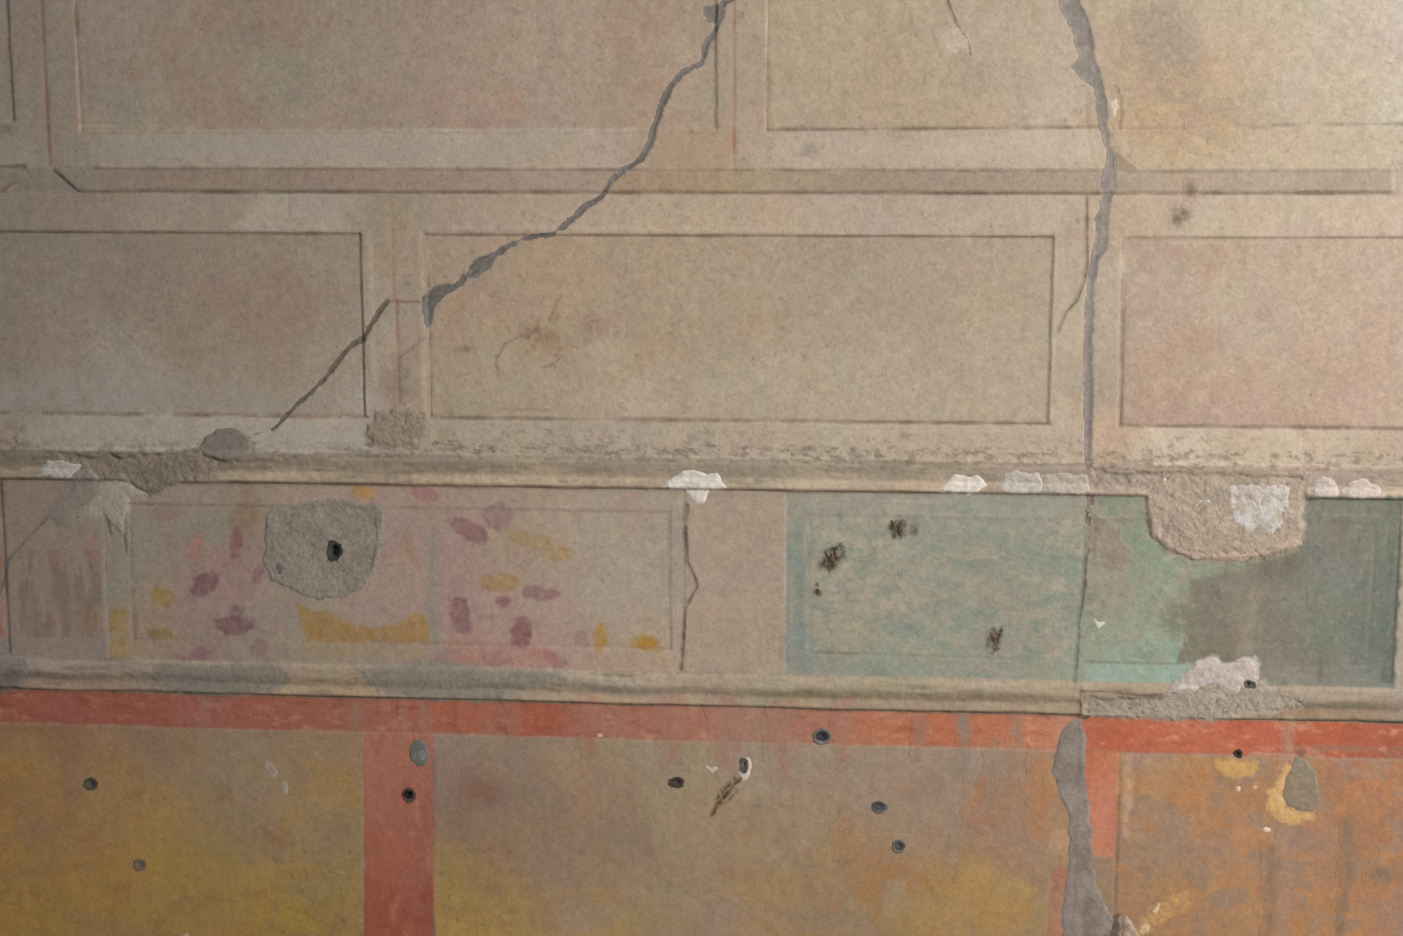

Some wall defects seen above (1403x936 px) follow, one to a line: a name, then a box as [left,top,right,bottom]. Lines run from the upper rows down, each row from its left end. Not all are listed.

crack [249,0,735,438]
crack [1058,0,1164,721]
spalling [41,427,252,555]
flaking render [664,470,727,504]
spalling [941,460,1382,570]
crack [679,502,700,672]
spalling [1077,652,1309,726]
spalling [1212,743,1321,827]
spalling [1109,887,1196,936]